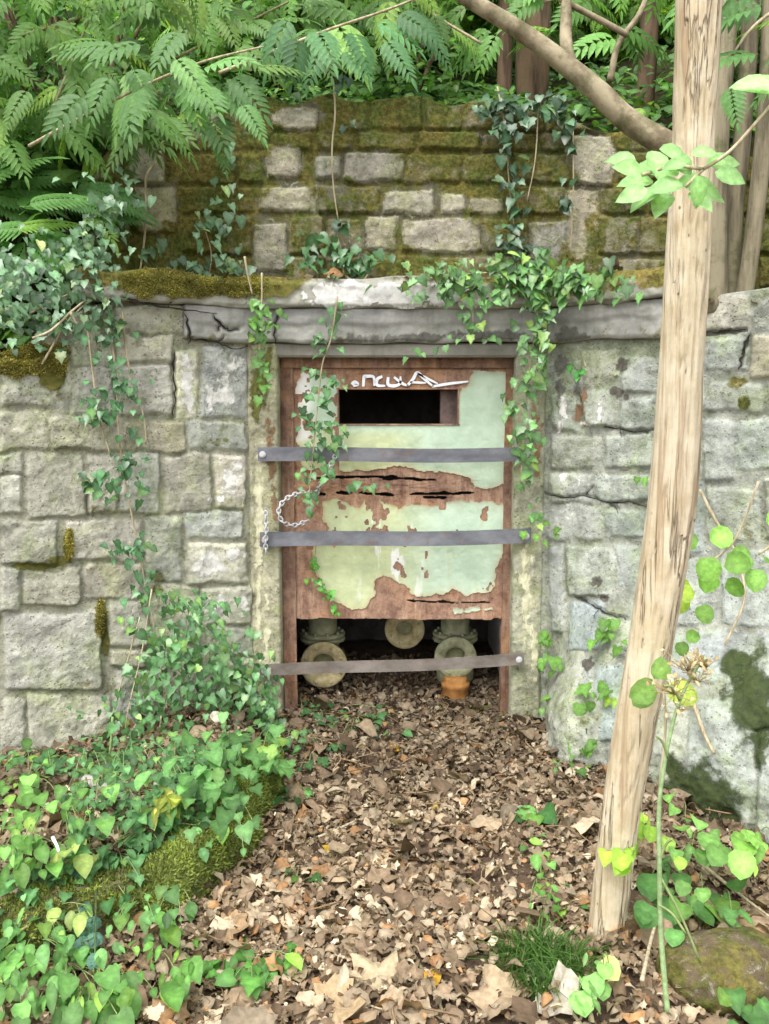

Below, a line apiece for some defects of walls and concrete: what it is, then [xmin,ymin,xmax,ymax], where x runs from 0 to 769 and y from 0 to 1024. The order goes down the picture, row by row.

crack [123,297,247,416]
crack [706,329,750,369]
crack [545,491,646,512]
damp [720,649,752,691]
damp [754,720,769,771]